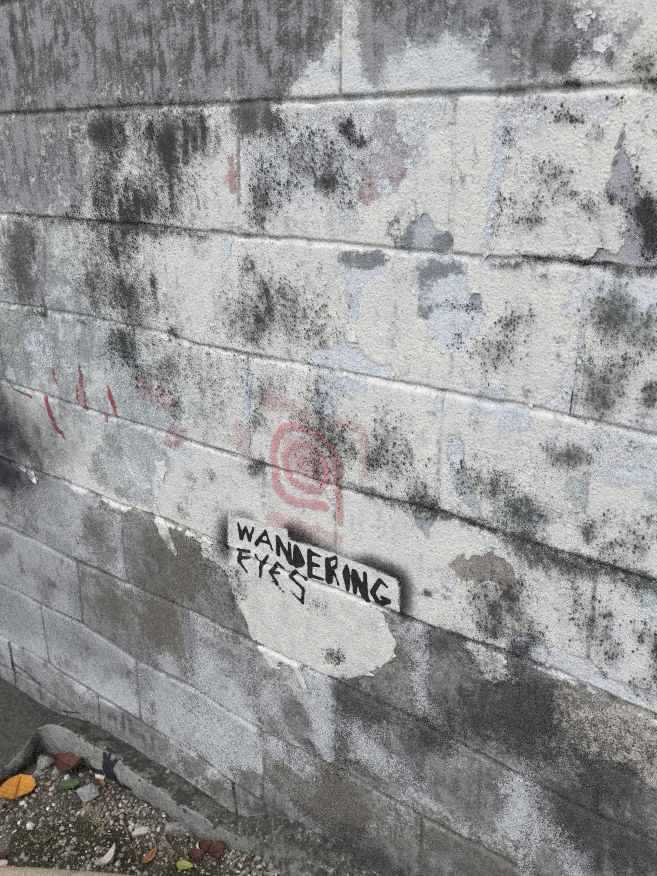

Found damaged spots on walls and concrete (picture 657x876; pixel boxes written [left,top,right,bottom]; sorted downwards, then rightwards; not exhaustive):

leakage [0,87,355,447]
peeling [241,96,446,239]
peeling [313,249,395,422]
leakage [336,113,373,149]
peeling [403,211,486,355]
peeling [483,94,626,271]
leakage [470,153,657,479]
peeling [474,123,657,432]
peeling [185,529,397,692]
leakage [210,243,657,876]
peeling [436,551,523,603]
peeling [466,632,657,790]